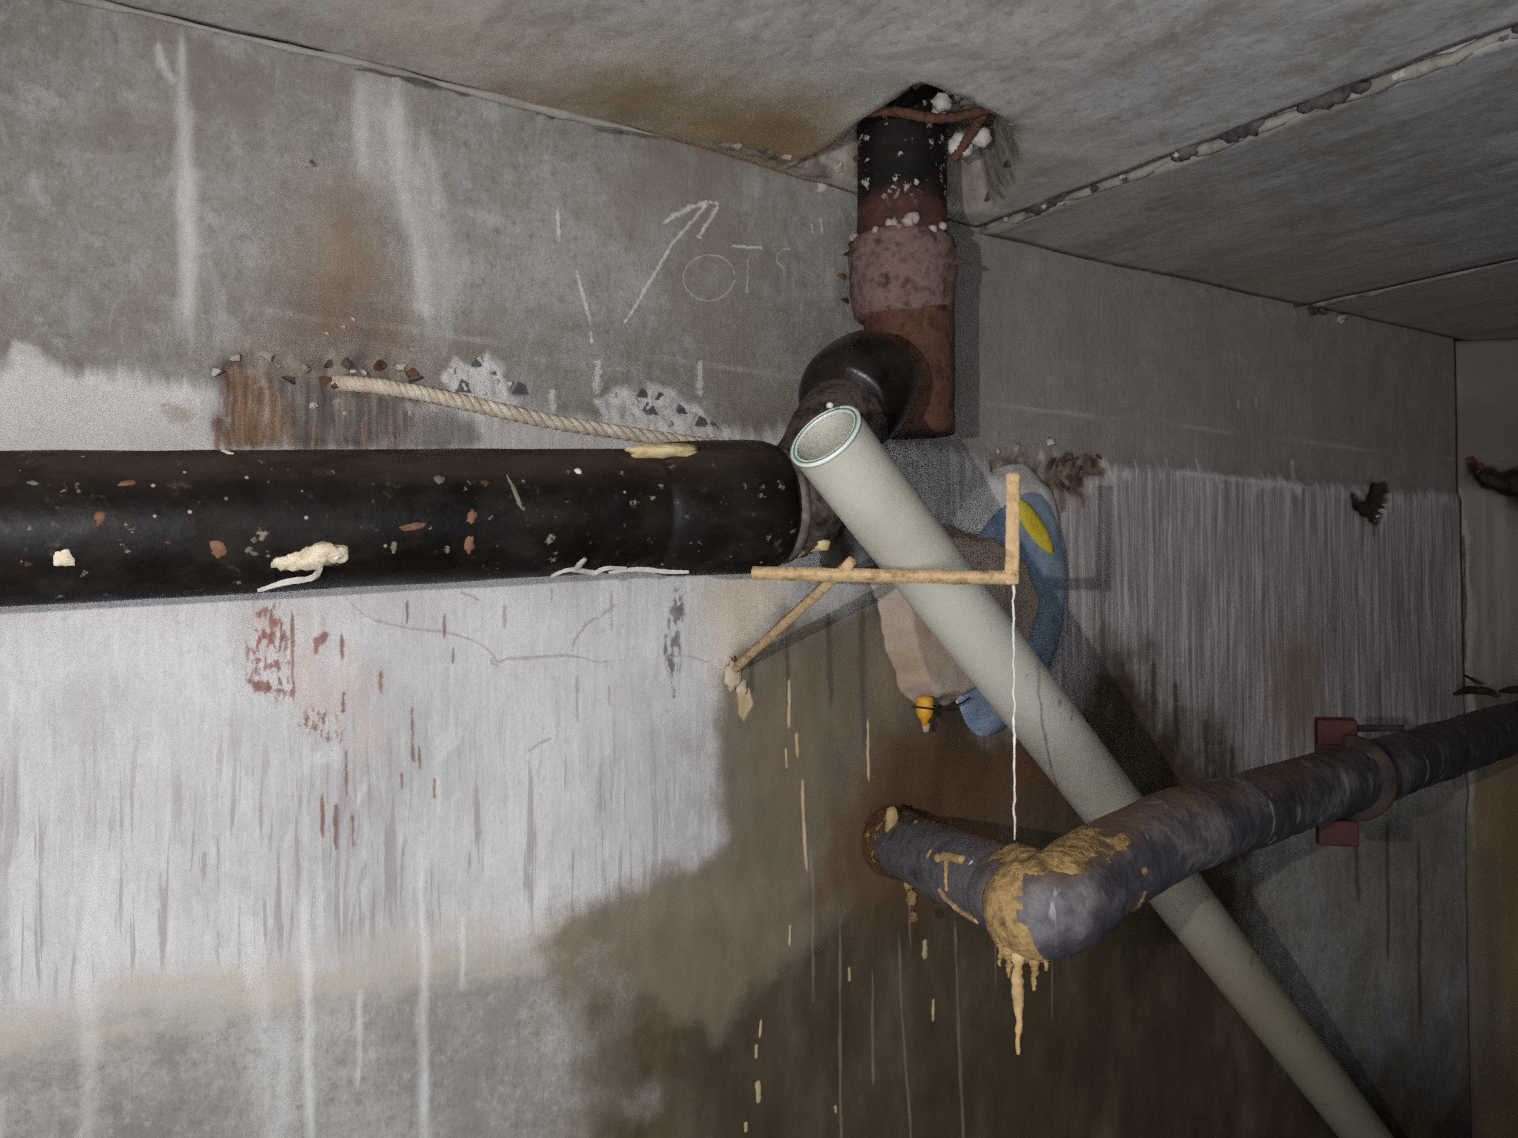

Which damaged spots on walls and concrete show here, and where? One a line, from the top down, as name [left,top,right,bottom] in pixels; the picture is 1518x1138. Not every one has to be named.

water stain [595,81,811,156]
peeling [0,345,191,451]
spalling [211,350,475,454]
flaking render [442,356,528,405]
flaking render [596,385,733,440]
corrosion [246,606,295,697]
corrosion [313,633,344,660]
corrosion [304,692,354,849]
corrosion [400,709,435,798]
water stain [553,597,1338,1138]
water stain [1374,1105,1433,1138]